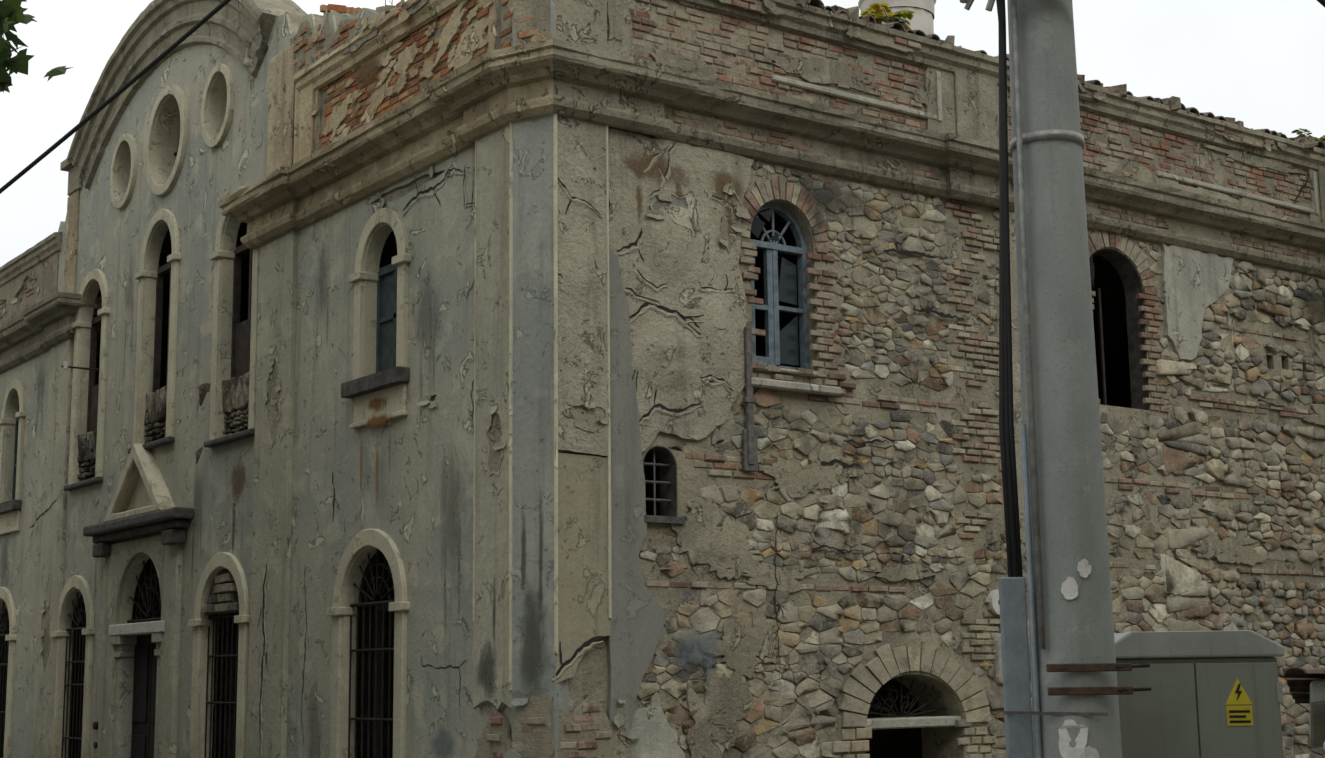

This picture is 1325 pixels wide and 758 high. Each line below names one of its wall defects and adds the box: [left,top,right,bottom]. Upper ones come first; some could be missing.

spalling [290,0,550,150]
crack [403,164,475,217]
crack [557,178,603,219]
crack [643,142,678,199]
crack [617,195,738,339]
crack [632,331,741,426]
damp [522,519,543,684]
damp [479,645,494,693]
crack [553,636,604,681]
flaking render [474,689,642,758]